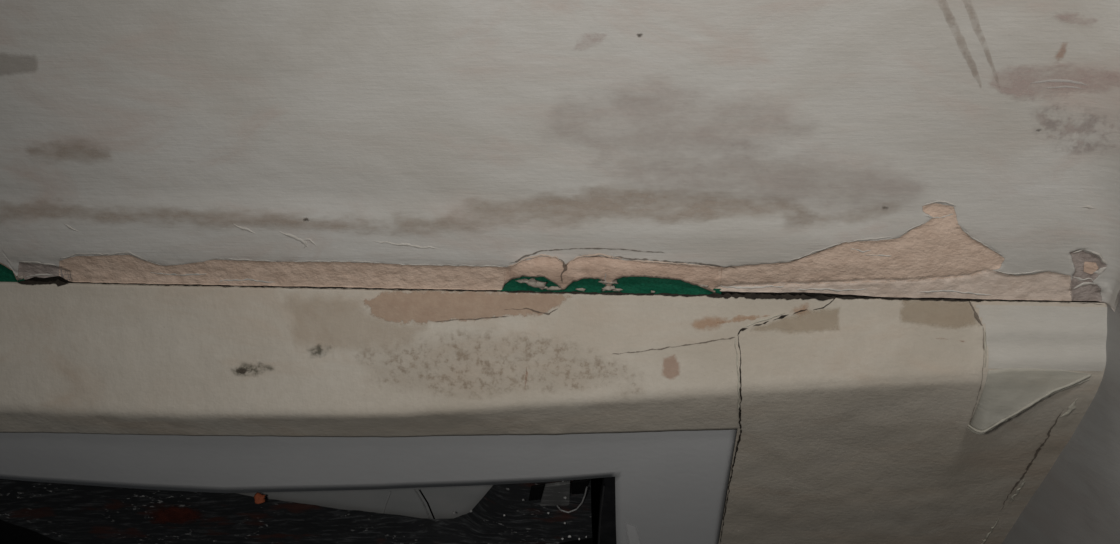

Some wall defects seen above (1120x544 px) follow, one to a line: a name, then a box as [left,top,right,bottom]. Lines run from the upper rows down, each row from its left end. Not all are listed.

crack [17,278,69,286]
flaking render [17,201,1108,323]
crack [108,248,1100,544]